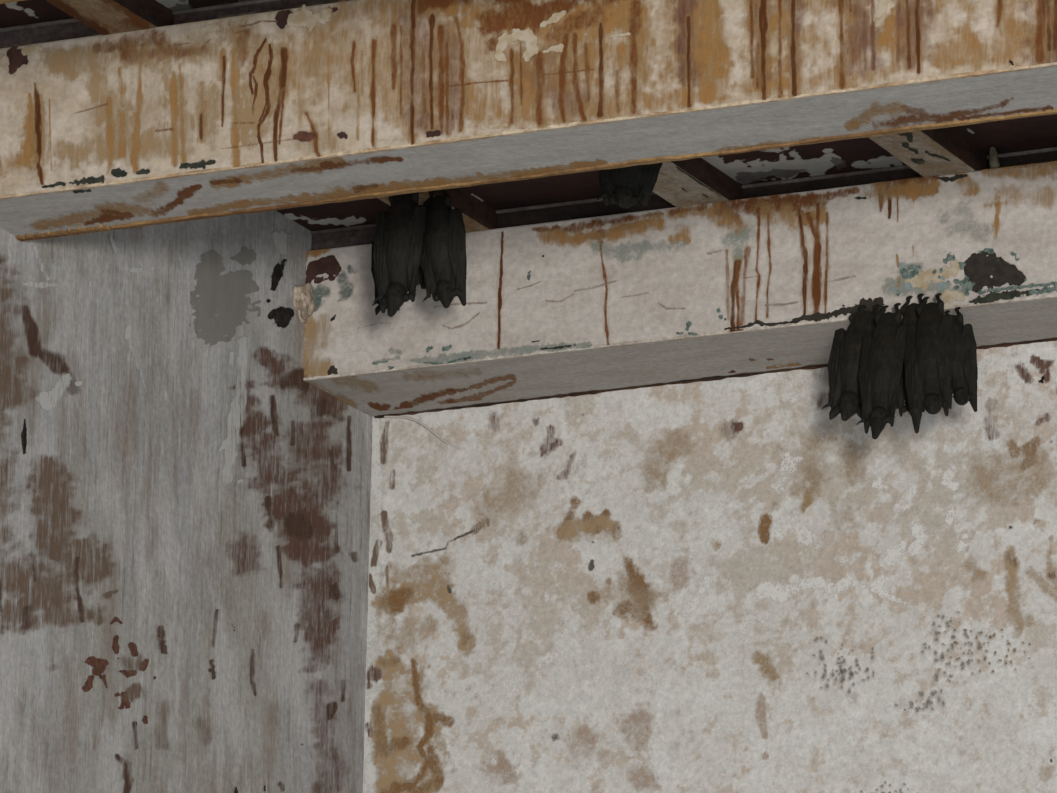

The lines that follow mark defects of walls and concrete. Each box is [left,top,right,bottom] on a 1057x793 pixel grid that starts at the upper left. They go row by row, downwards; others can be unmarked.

peeling [494,10,566,62]
corrosion [0,0,1057,230]
peeling [42,167,150,194]
peeling [180,159,216,169]
corrosion [532,175,940,345]
peeling [717,247,1057,330]
corrosion [1016,355,1054,383]
corrosion [230,317,516,793]
damp [372,559,475,655]
damp [754,515,856,603]
damp [869,482,929,608]
damp [371,630,453,793]